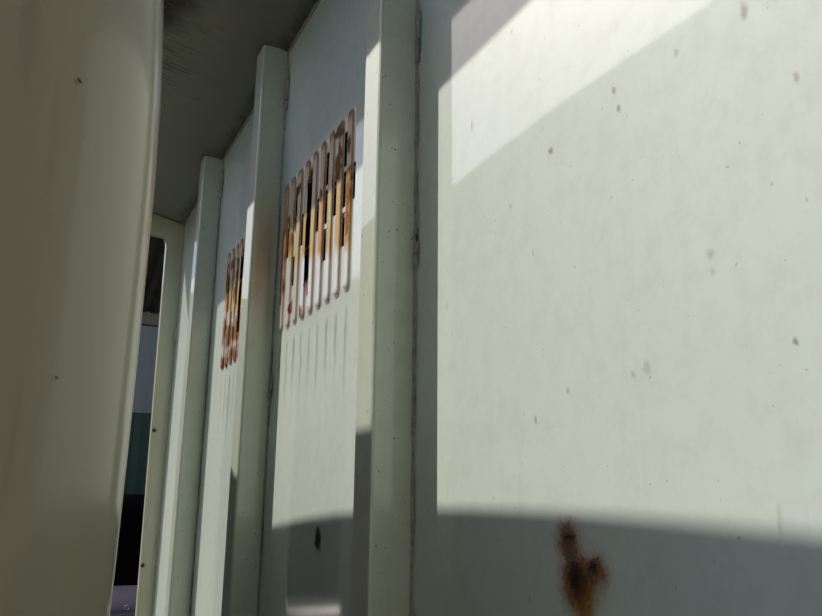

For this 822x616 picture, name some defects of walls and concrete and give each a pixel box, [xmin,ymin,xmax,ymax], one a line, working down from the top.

rust [323,121,353,235]
rust [279,216,301,317]
rust [558,521,605,616]